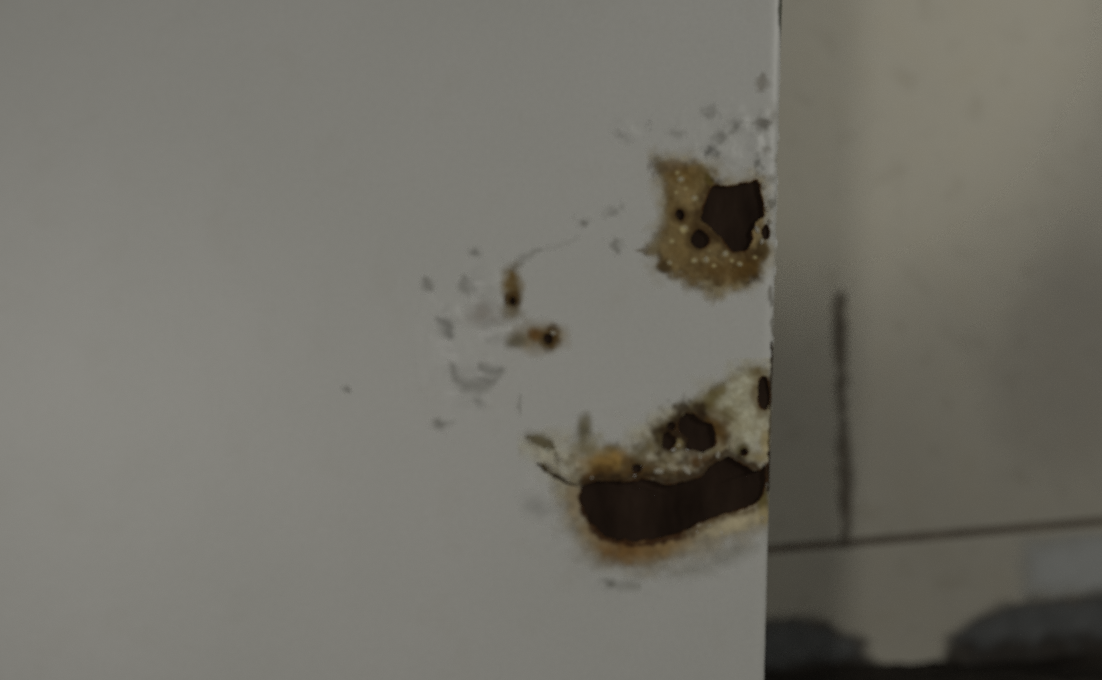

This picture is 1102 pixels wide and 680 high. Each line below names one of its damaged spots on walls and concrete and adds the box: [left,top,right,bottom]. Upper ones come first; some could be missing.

rust [642,158,771,289]
spalling [691,180,772,252]
rust [503,270,521,316]
rust [509,324,561,350]
hole [758,376,770,409]
rust [533,341,773,567]
hole [662,413,716,453]
hole [579,448,766,542]